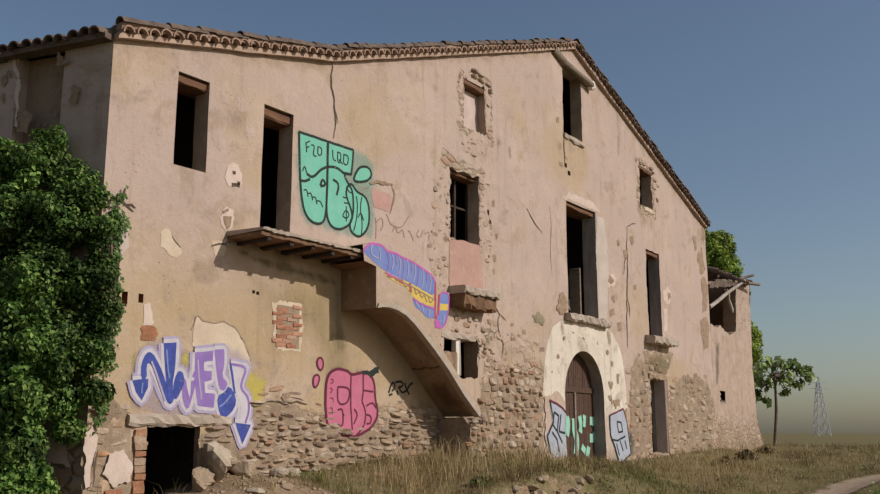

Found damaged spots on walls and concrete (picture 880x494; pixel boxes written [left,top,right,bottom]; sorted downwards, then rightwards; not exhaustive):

flaking render [1,59,32,134]
crack [330,63,338,136]
flaking render [459,68,493,157]
flaking render [220,207,234,231]
flaking render [225,162,242,189]
flaking render [370,180,395,213]
flaking render [427,168,451,291]
flaking render [477,174,498,278]
flaking render [272,300,304,352]
flaking render [440,308,565,457]
flaking render [597,341,718,456]
flaking render [45,399,133,494]